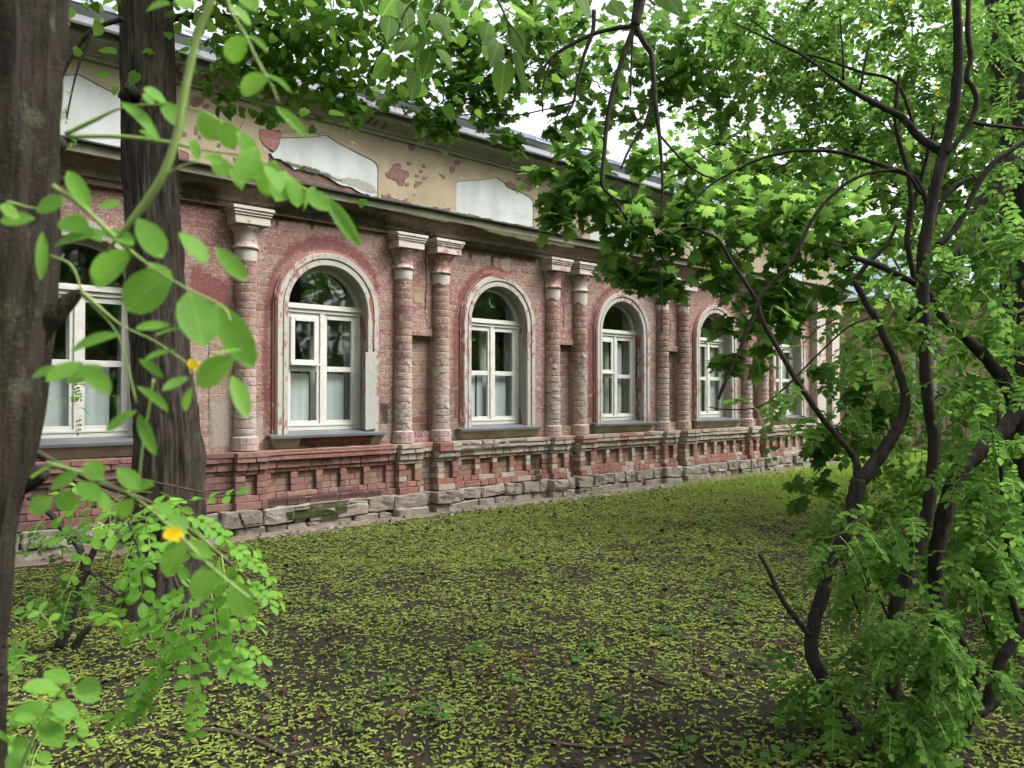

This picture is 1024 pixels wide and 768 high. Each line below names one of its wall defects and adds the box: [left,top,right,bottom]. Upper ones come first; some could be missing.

flaking render [259,128,368,196]
peeling [382,144,533,228]
damp [266,489,382,522]